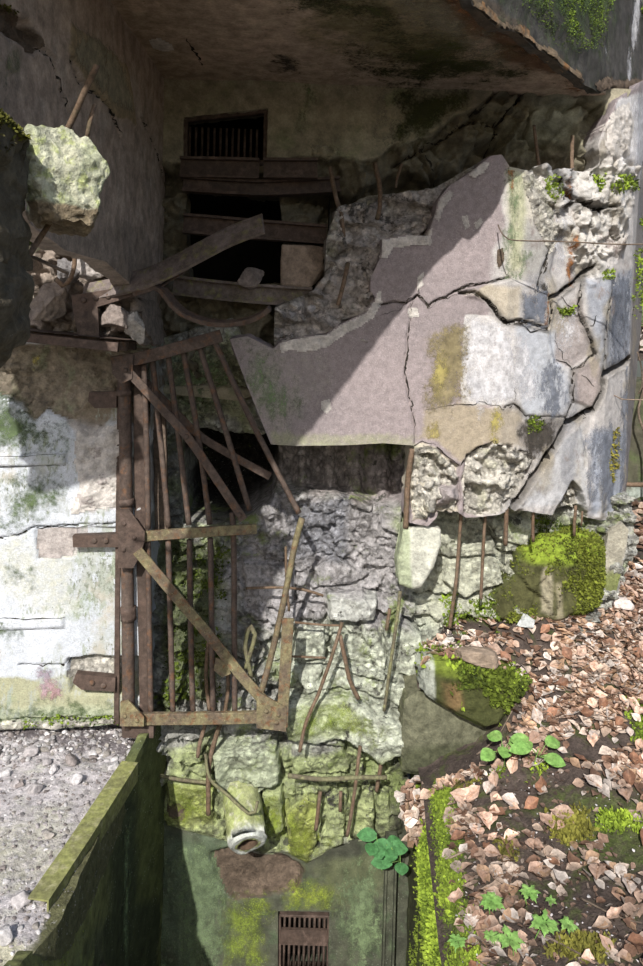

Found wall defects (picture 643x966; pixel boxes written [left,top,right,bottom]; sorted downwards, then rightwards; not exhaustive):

spalling [472,0,642,93]
water stain [631,0,640,46]
spalling [379,191,453,258]
spalling [280,291,383,353]
spalling [0,345,149,419]
crack [379,250,615,499]
flaking render [71,424,119,514]
spalling [412,444,532,519]
spalling [556,482,580,508]
flaking render [36,527,77,558]
crack [0,522,116,540]
water stain [21,670,86,722]